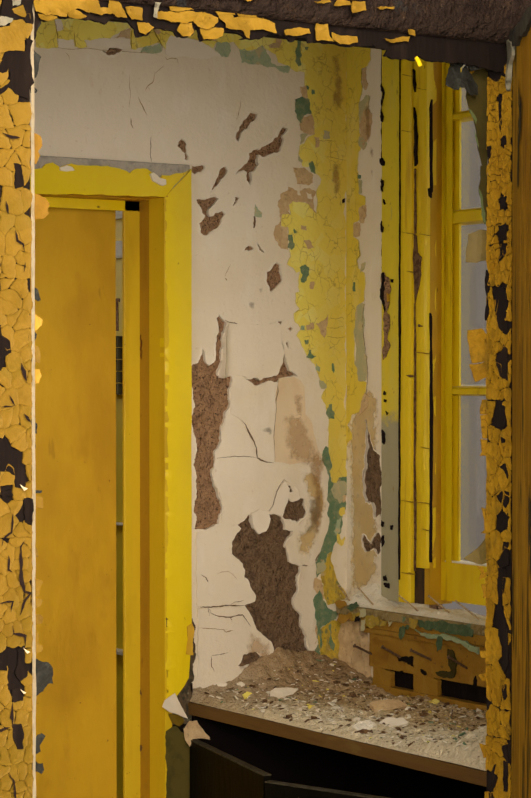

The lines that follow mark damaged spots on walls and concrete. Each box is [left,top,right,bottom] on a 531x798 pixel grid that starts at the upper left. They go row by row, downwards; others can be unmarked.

peeling [33,0,506,679]
peeling [0,0,53,798]
crack [221,391,279,463]
peeling [464,68,513,798]
crack [203,600,250,632]
peeling [162,693,210,747]
spalling [352,699,409,734]